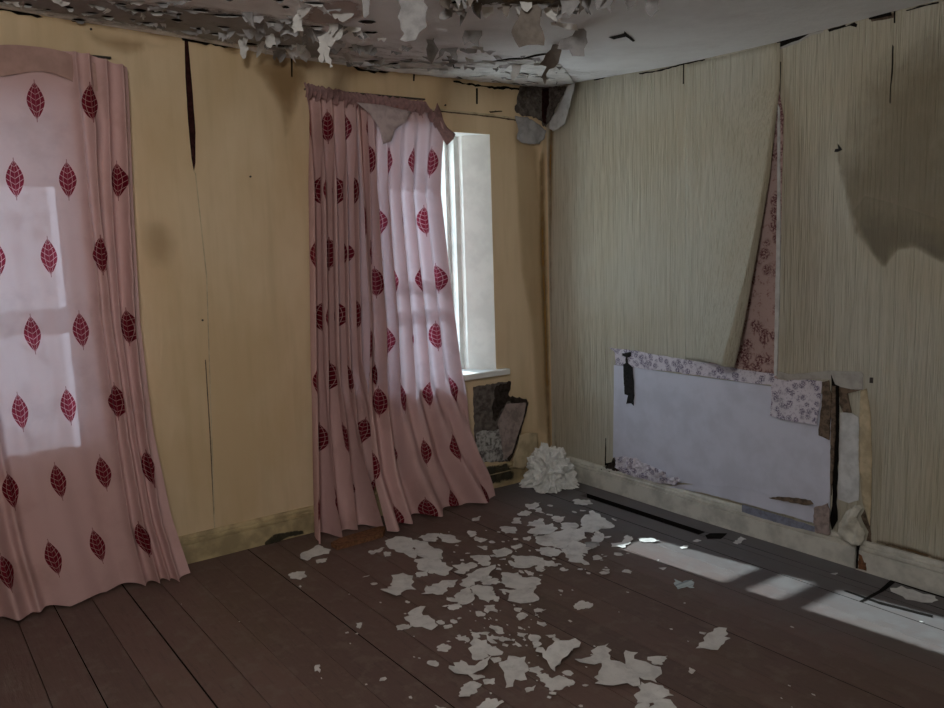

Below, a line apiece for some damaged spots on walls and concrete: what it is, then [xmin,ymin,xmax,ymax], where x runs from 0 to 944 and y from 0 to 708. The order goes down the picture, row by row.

crack [0,8,42,18]
crack [182,38,233,169]
peeling [0,0,636,144]
crack [353,66,388,74]
crack [453,80,519,104]
spalling [473,381,538,469]
flaking render [813,412,860,535]